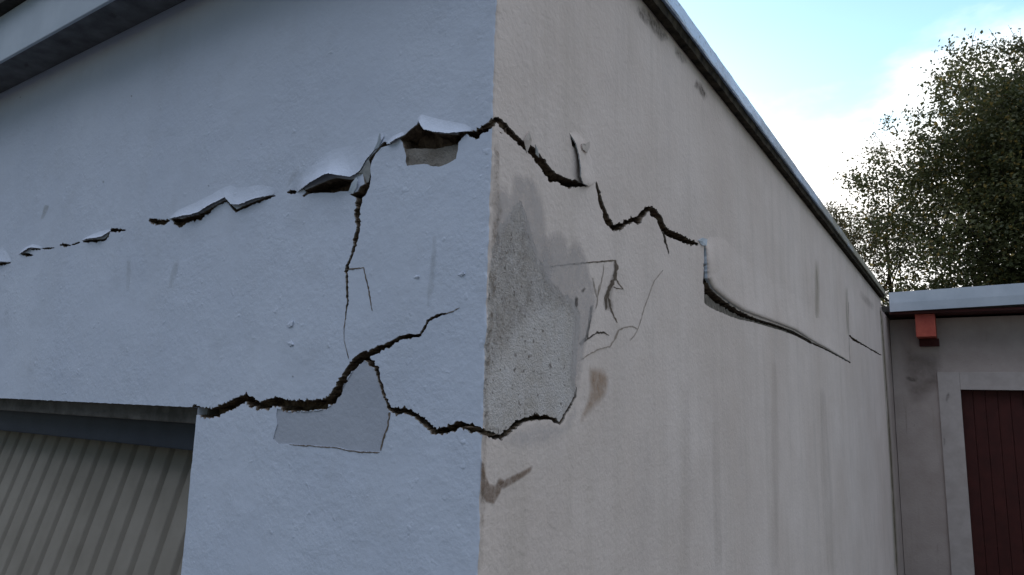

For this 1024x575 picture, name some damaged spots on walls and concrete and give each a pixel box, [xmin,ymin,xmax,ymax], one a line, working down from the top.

crack [0,228,126,266]
peeling [273,361,389,452]
crack [149,133,577,453]
flaking render [400,123,463,167]
peeling [483,200,580,434]
crack [458,117,898,575]